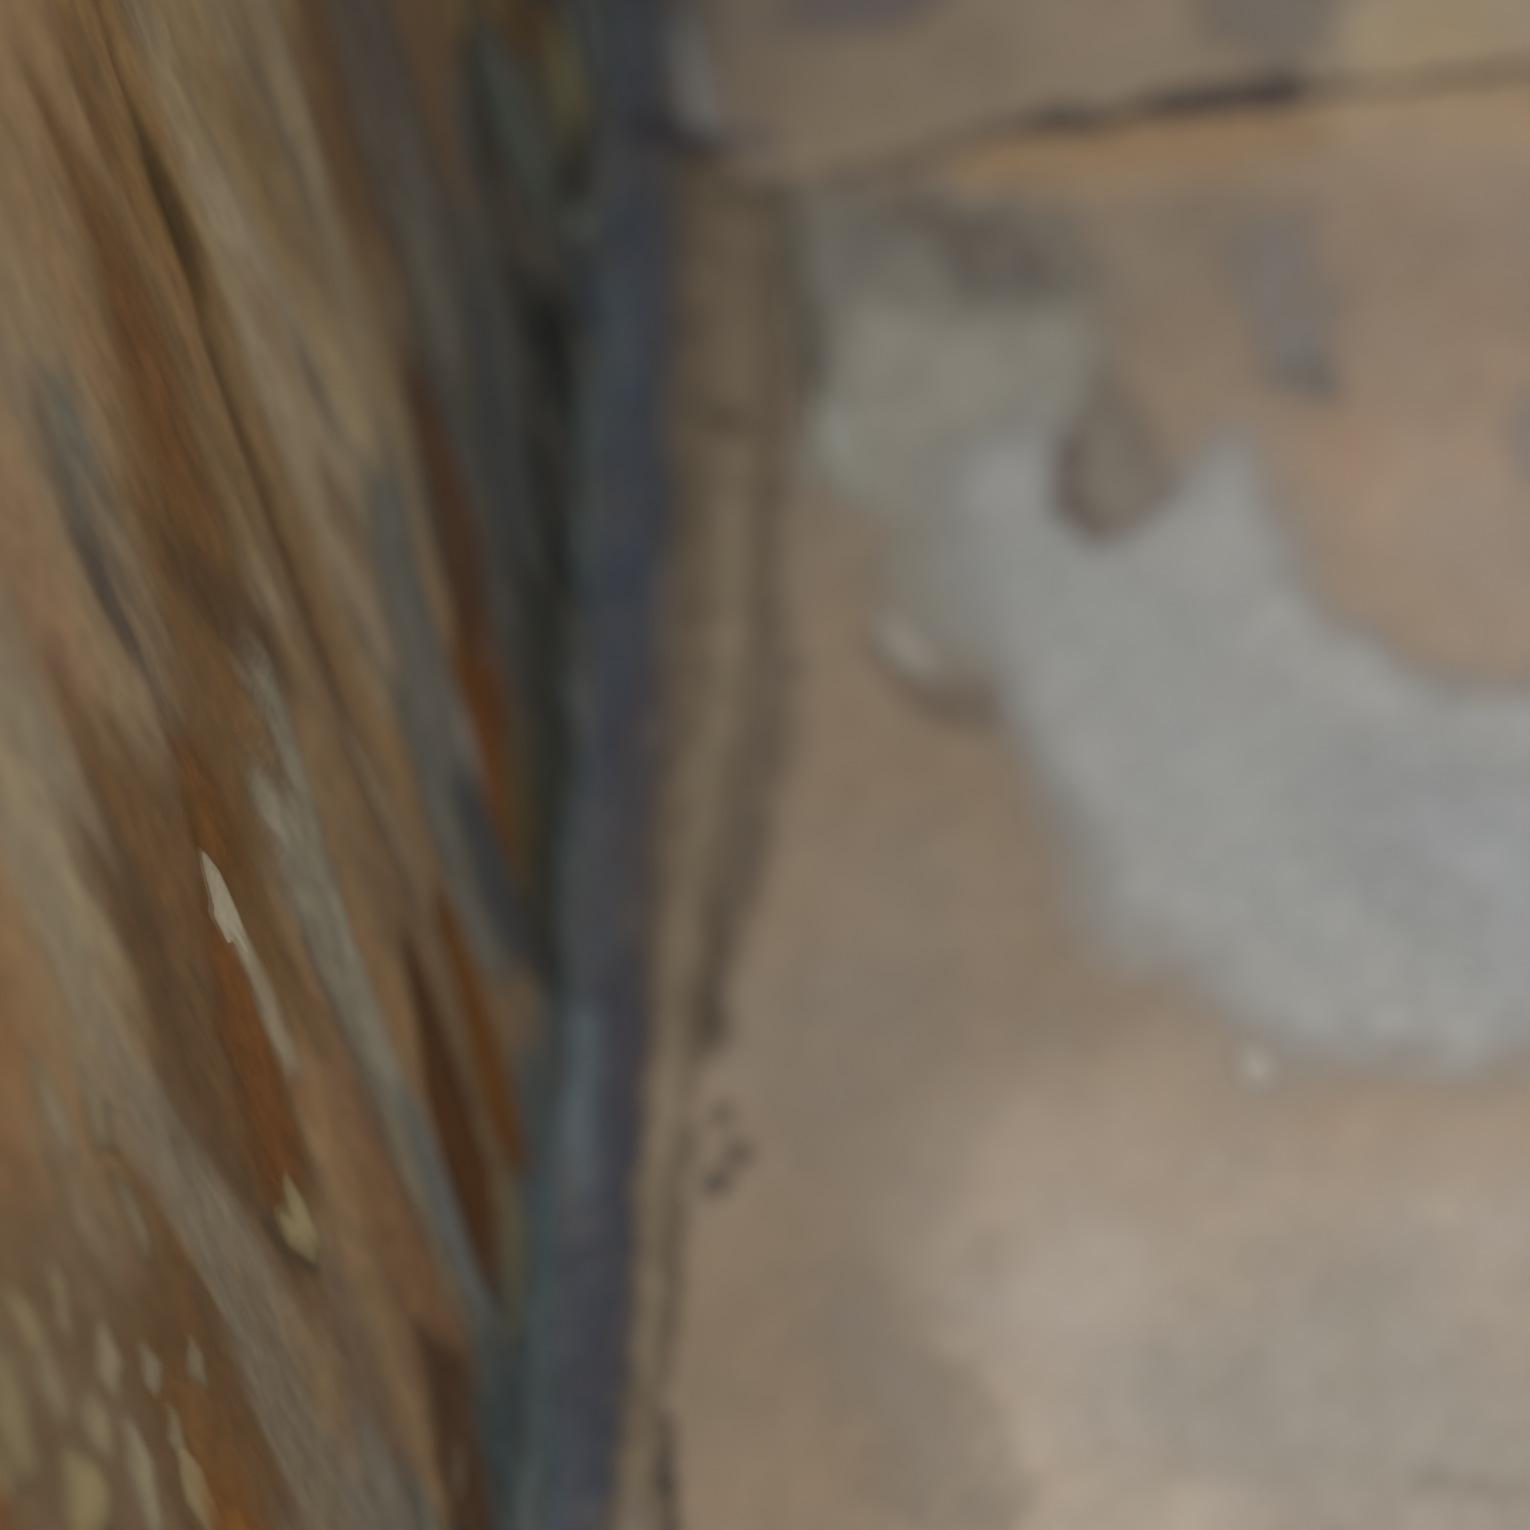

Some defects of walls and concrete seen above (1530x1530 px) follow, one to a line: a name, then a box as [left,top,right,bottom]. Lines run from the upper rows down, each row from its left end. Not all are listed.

crack [627,109,780,156]
crack [829,64,1528,183]
leakage [775,182,1530,1091]
peeling [0,1229,216,1530]
rust [71,699,302,1290]
rust [146,1195,281,1530]
peeling [200,850,297,1072]
peeling [276,1174,321,1261]
spalling [406,891,525,1342]